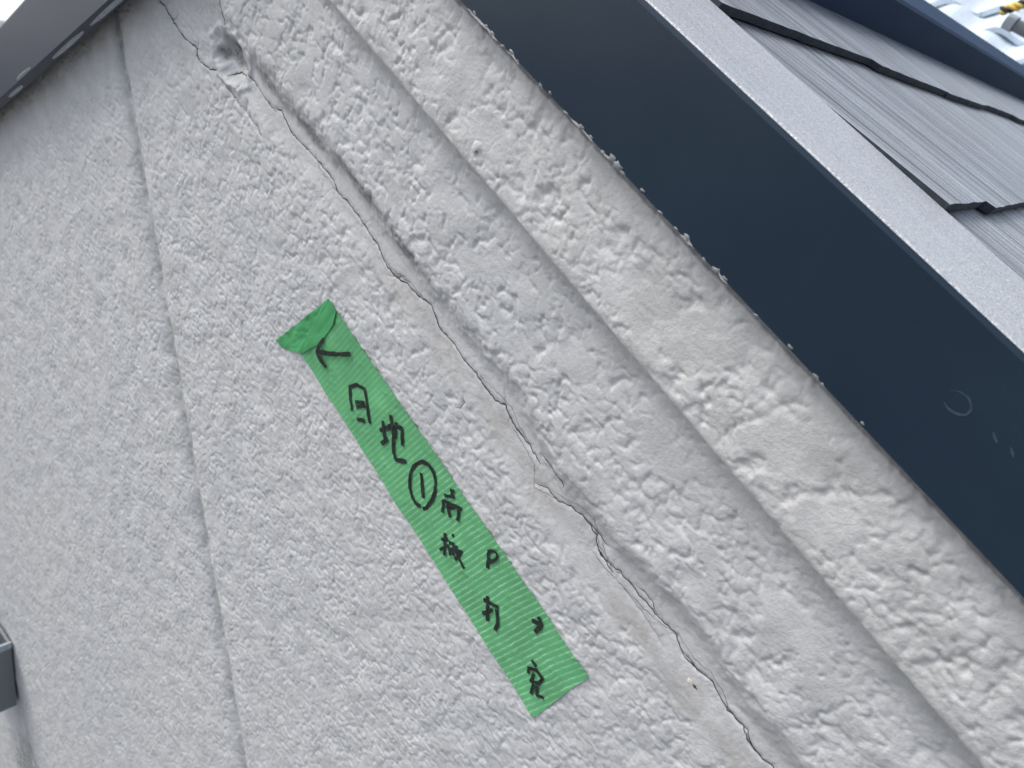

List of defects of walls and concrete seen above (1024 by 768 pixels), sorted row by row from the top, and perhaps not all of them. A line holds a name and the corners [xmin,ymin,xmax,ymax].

crack [160,1,774,768]